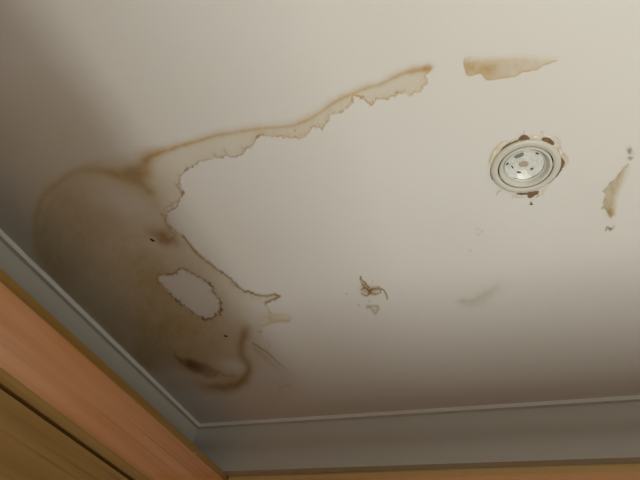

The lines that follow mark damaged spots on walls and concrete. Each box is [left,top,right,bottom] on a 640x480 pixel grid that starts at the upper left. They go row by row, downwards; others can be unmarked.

leakage [462,52,560,82]
leakage [0,59,438,399]
peeling [487,129,571,205]
leakage [600,144,637,232]